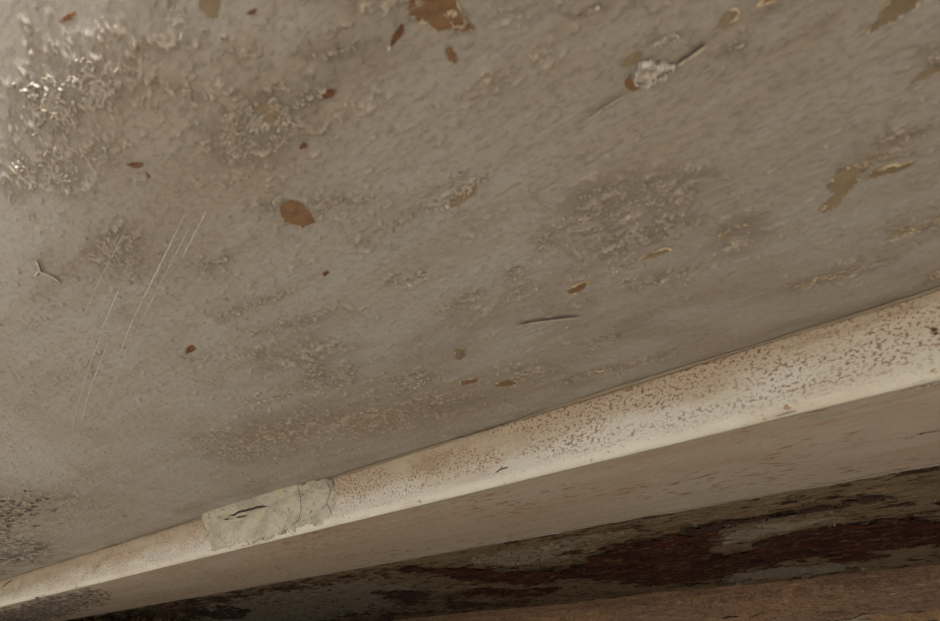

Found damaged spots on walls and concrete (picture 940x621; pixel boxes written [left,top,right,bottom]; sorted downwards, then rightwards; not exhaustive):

peeling [387,0,476,51]
peeling [864,0,921,35]
peeling [446,46,458,65]
peeling [619,51,678,92]
peeling [818,160,916,214]
peeling [280,199,316,229]
rust [394,494,940,609]